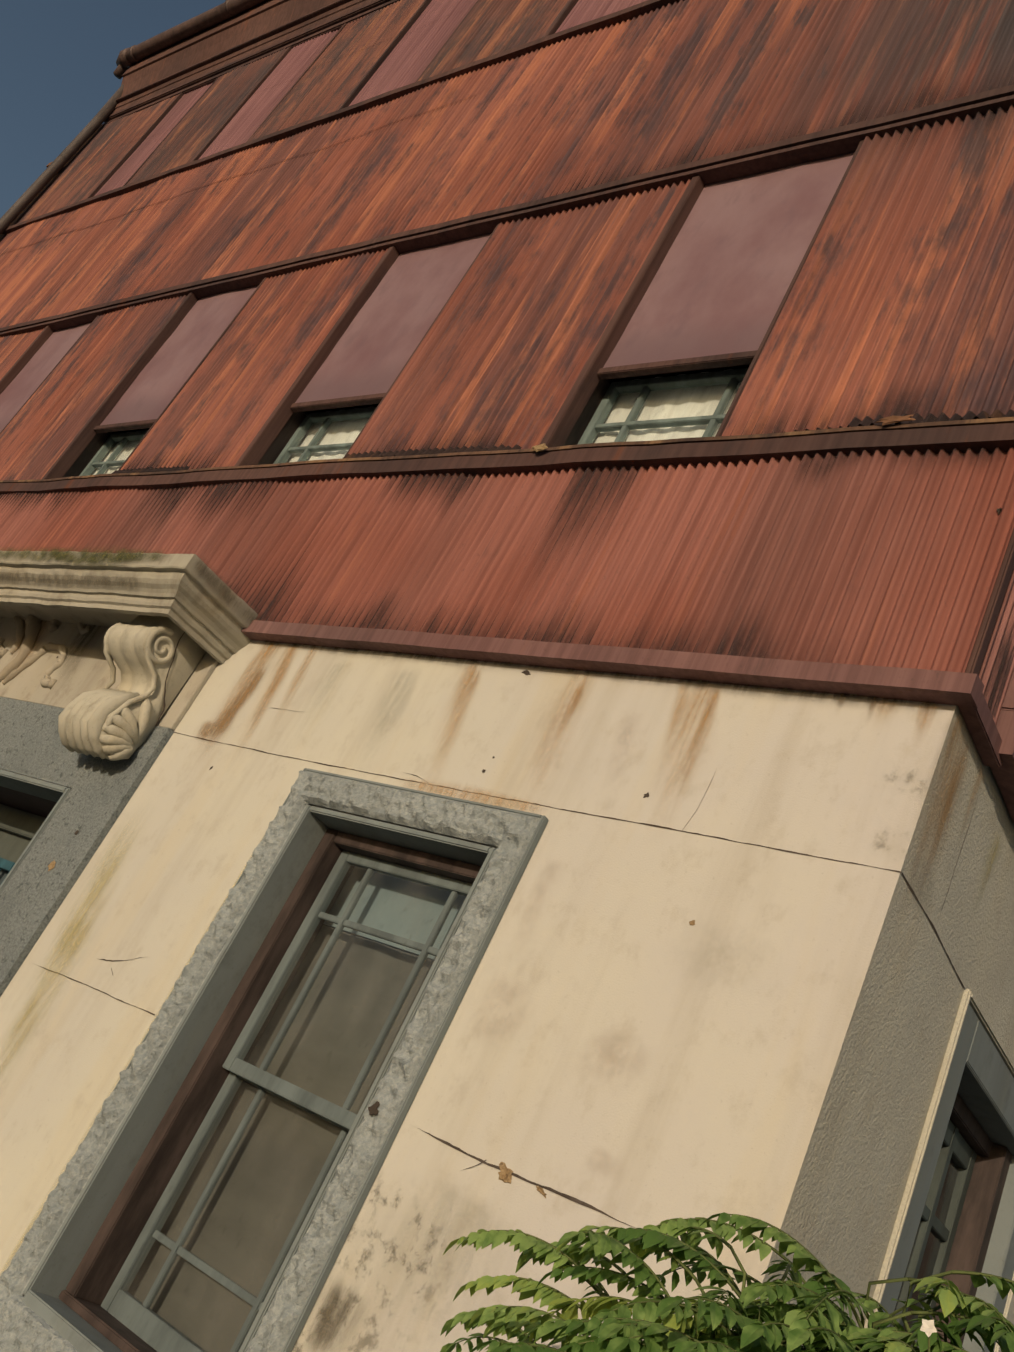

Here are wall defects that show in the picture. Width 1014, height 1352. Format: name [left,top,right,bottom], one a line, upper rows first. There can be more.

corrosion [202,644,294,735]
crack [35,957,155,1015]
crack [418,1128,635,1228]